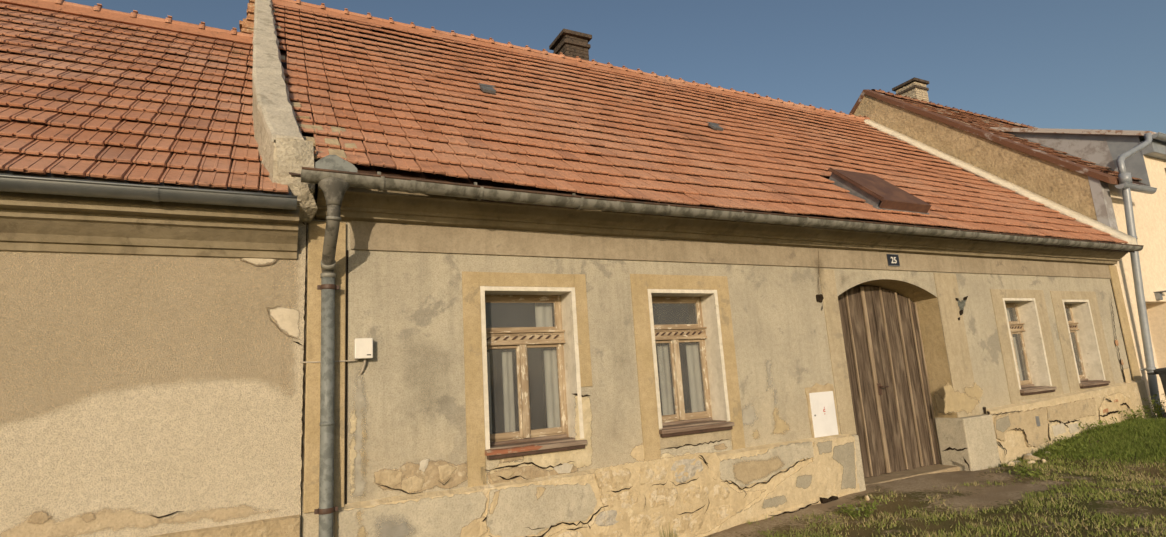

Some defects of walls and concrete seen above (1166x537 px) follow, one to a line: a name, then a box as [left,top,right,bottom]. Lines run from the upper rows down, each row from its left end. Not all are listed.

flaking render [1099,392,1138,424]
flaking render [1049,421,1084,441]
flaking render [374,459,468,494]
flaking render [487,395,766,537]
crack [659,439,808,498]
crack [770,496,838,516]